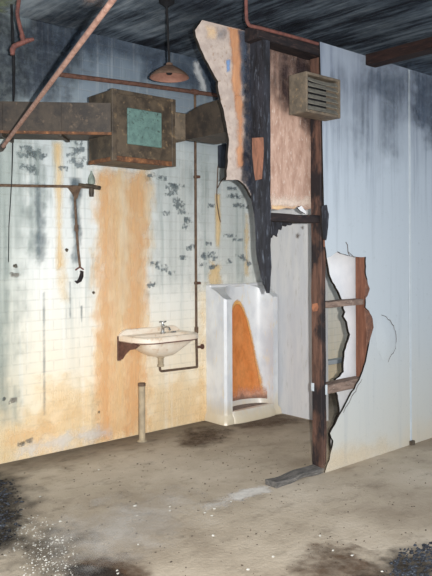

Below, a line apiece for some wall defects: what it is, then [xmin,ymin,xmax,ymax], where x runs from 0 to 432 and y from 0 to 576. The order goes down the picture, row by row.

rust [229,28,244,167]
peeling [252,137,264,180]
spalling [364,309,374,348]